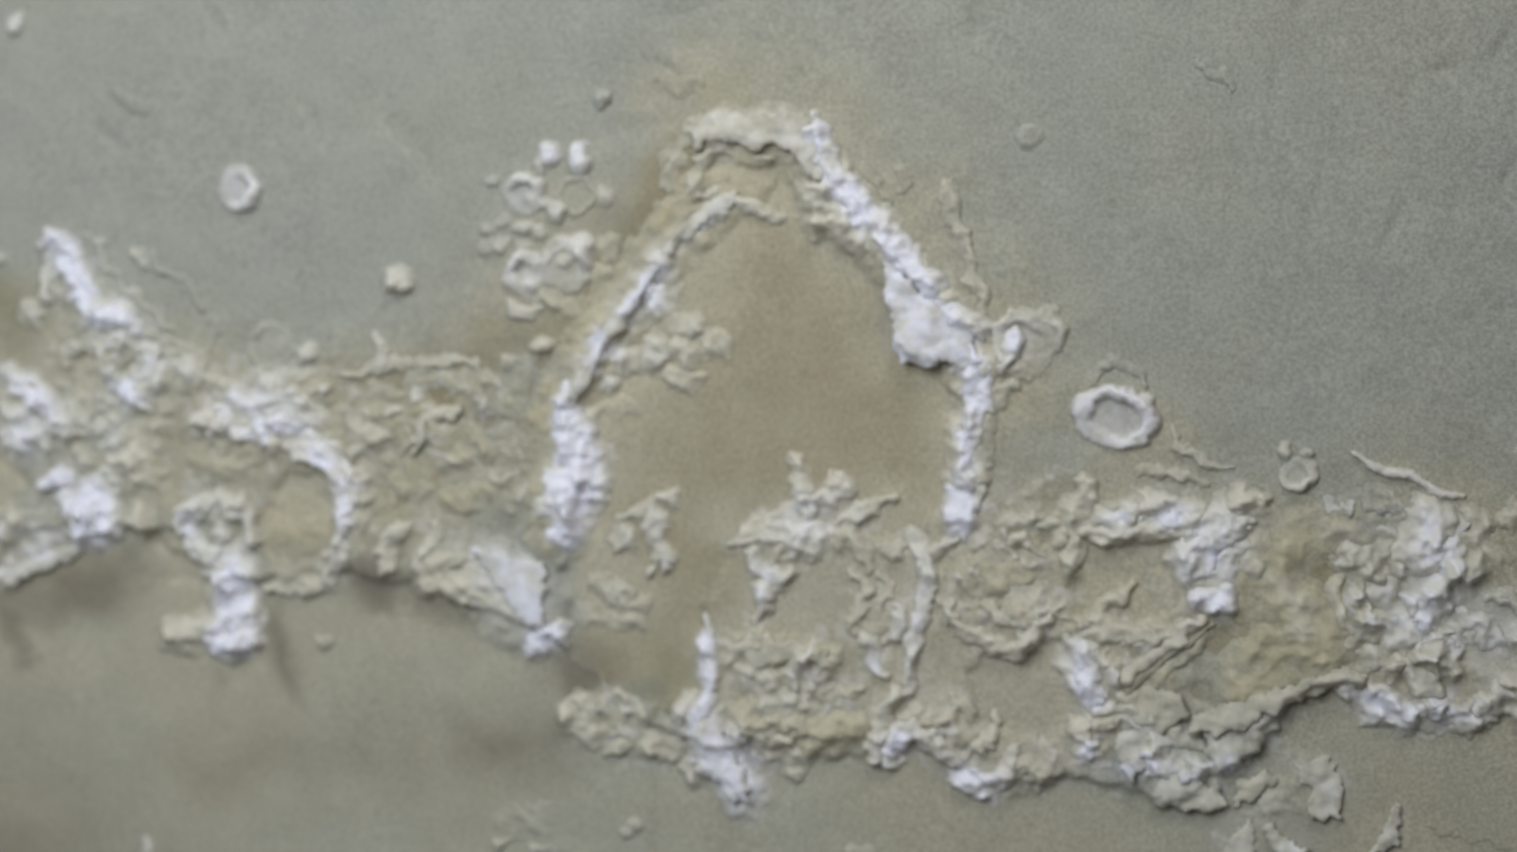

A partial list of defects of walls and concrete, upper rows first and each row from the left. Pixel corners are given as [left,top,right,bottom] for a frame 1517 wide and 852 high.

peeling [0,134,789,664]
peeling [554,667,690,775]
efflorescence [669,612,774,823]
peeling [680,99,1517,852]